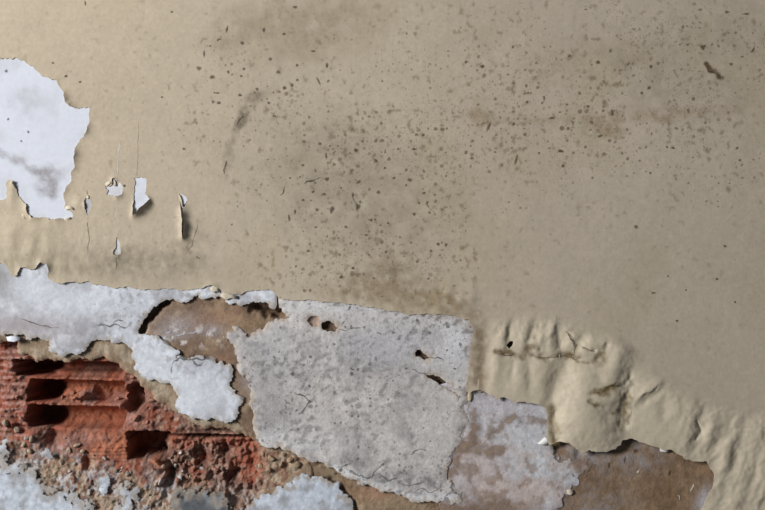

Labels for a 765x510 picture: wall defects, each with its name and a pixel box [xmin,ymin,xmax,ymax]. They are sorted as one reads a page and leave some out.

peeling [0,58,90,221]
peeling [105,178,125,197]
peeling [132,177,149,215]
flaking render [0,262,714,510]